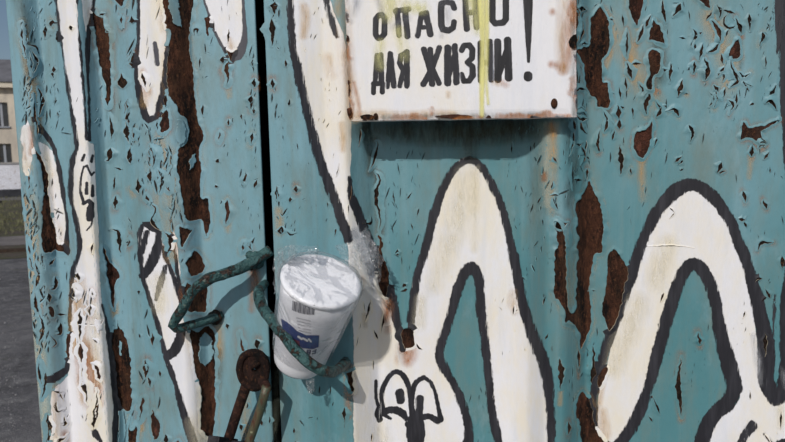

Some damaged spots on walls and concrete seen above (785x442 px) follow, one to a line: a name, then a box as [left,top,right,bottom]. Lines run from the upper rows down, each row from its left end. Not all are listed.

peeling [16,19,37,78]
peeling [576,3,616,111]
peeling [625,0,669,94]
peeling [693,0,744,62]
peeling [21,92,70,272]
peeling [630,117,657,163]
peeling [735,115,782,146]
peeling [546,178,632,352]
peeling [62,243,164,442]